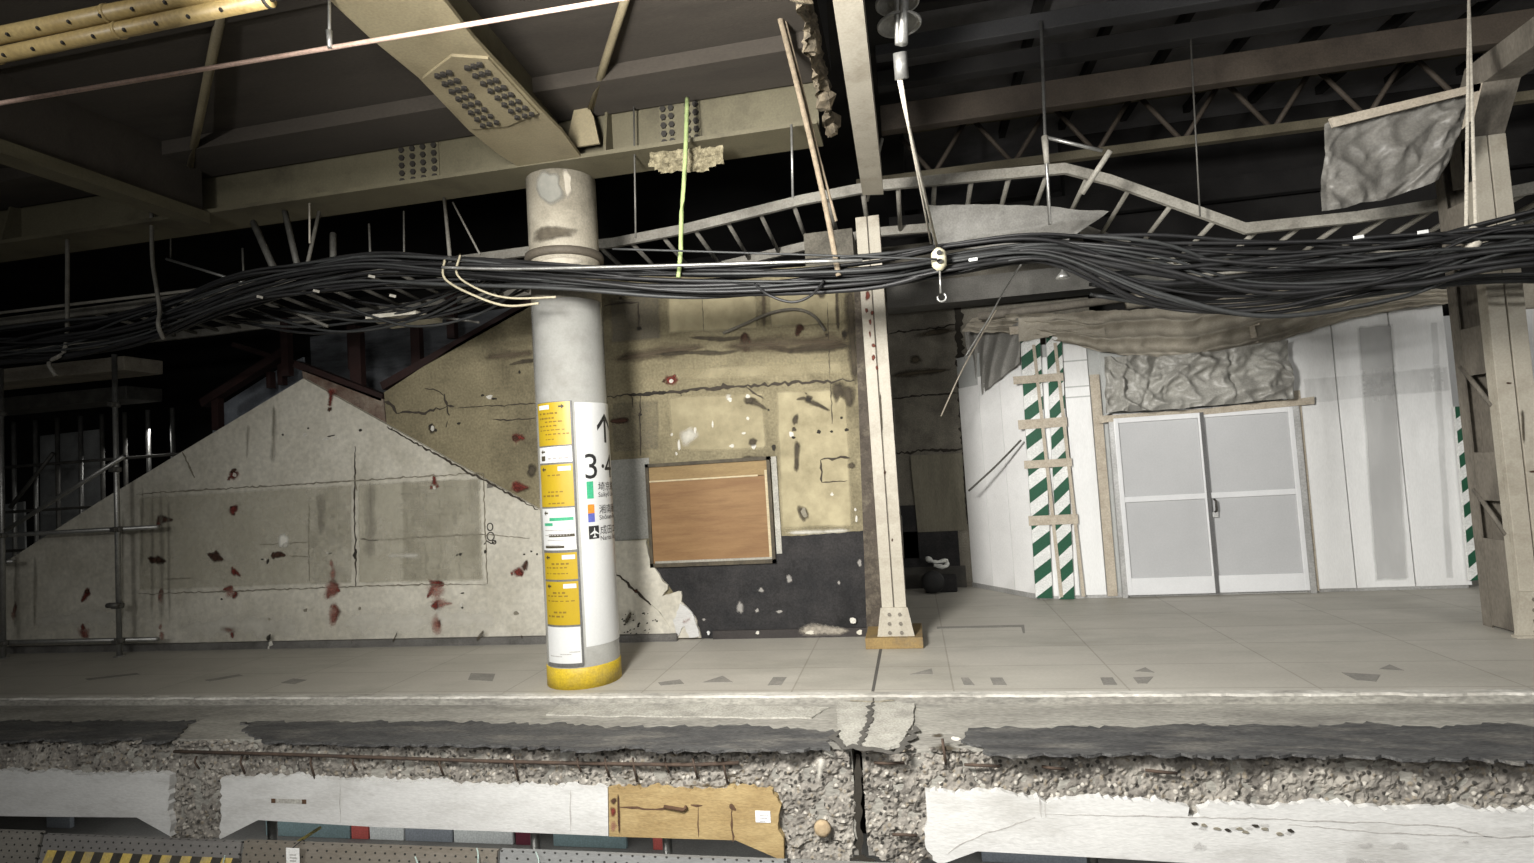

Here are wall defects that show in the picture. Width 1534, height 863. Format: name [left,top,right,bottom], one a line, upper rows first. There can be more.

spalling [790,0,841,137]
crack [136,388,538,595]
rust [208,551,240,598]
rust [326,561,341,622]
rust [427,580,452,631]
crack [616,574,651,605]
flaking render [615,539,710,638]
spalling [801,618,862,635]
spalling [0,733,1534,863]
crack [828,697,920,862]